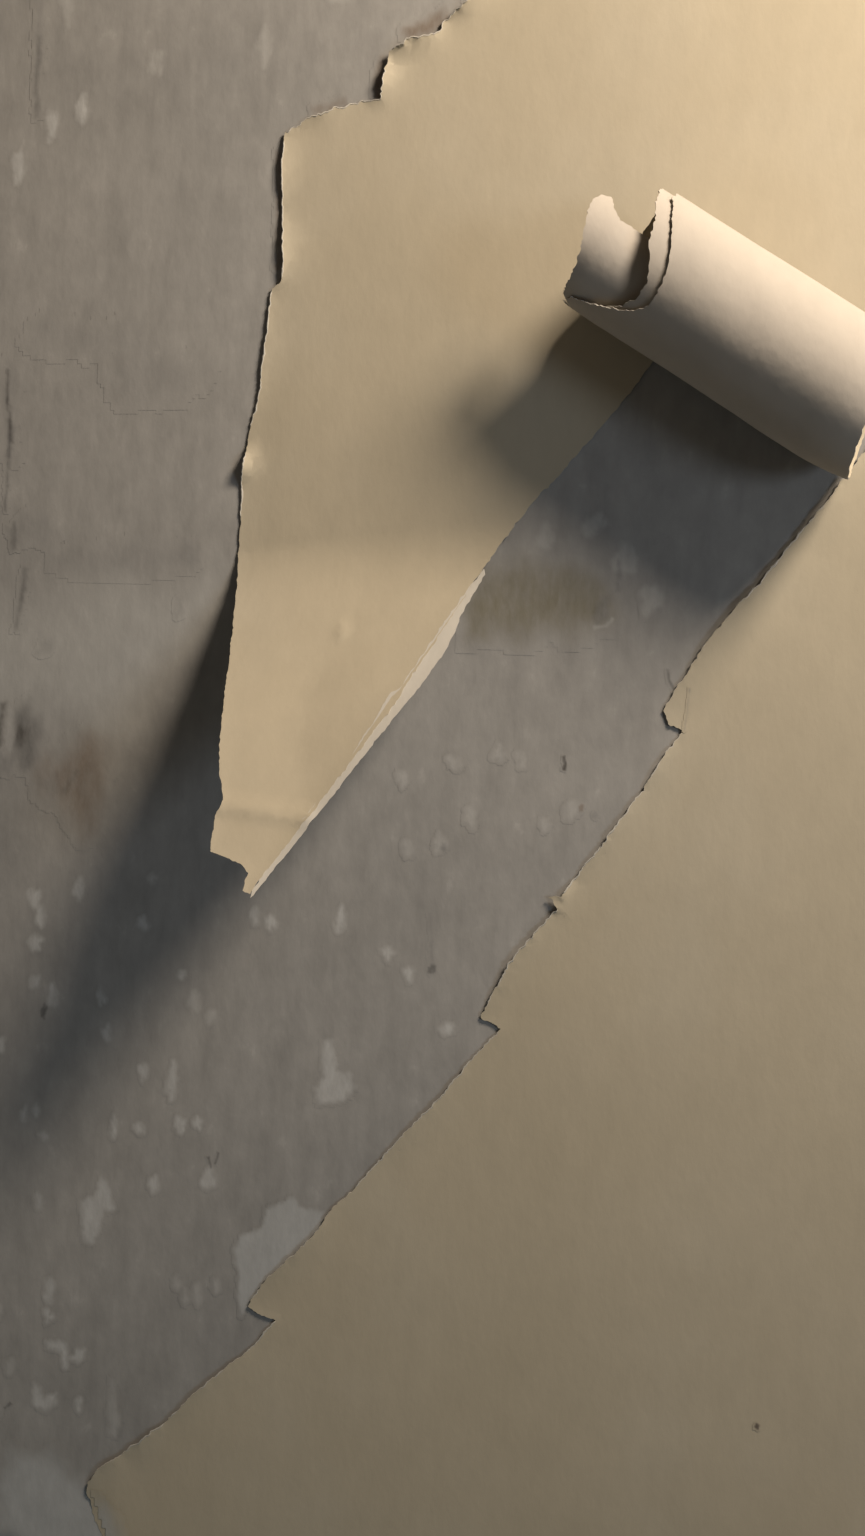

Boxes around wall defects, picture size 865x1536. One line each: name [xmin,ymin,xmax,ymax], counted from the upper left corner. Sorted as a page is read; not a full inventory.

flaking render [43,89,93,147]
peeling [210,508,528,937]
flaking render [22,885,50,955]
flaking render [135,1056,206,1138]
flaking render [311,1035,360,1109]
flaking render [76,1172,120,1248]
flaking render [29,1274,88,1417]